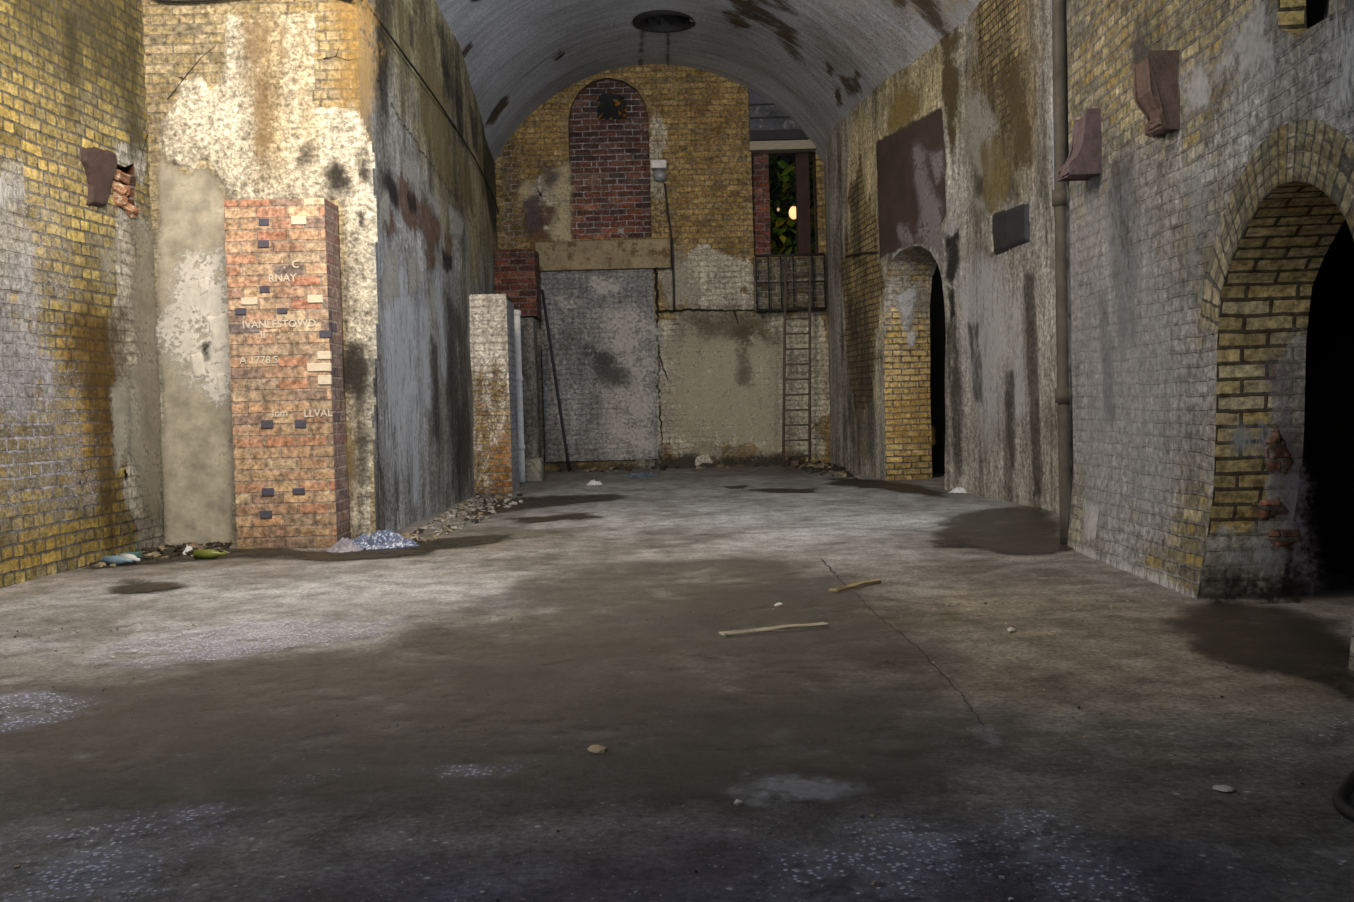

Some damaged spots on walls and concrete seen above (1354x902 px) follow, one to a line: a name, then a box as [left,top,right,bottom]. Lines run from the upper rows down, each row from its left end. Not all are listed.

leakage [0,167,123,537]
flaking render [159,11,464,540]
leakage [346,395,367,483]
leakage [378,243,470,525]
crack [821,559,993,736]
leakage [933,251,1354,698]